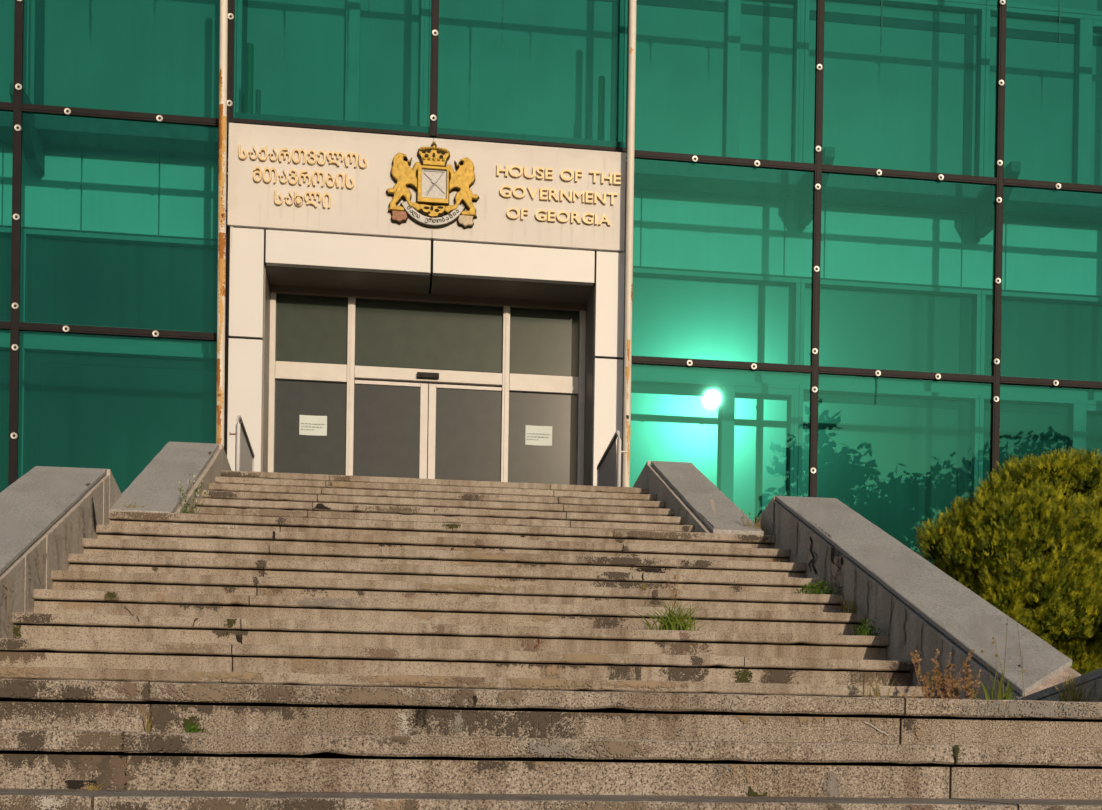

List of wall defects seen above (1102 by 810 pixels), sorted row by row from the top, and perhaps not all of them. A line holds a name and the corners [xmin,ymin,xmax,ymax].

corrosion [216,69,227,448]
crack [808,537,855,607]